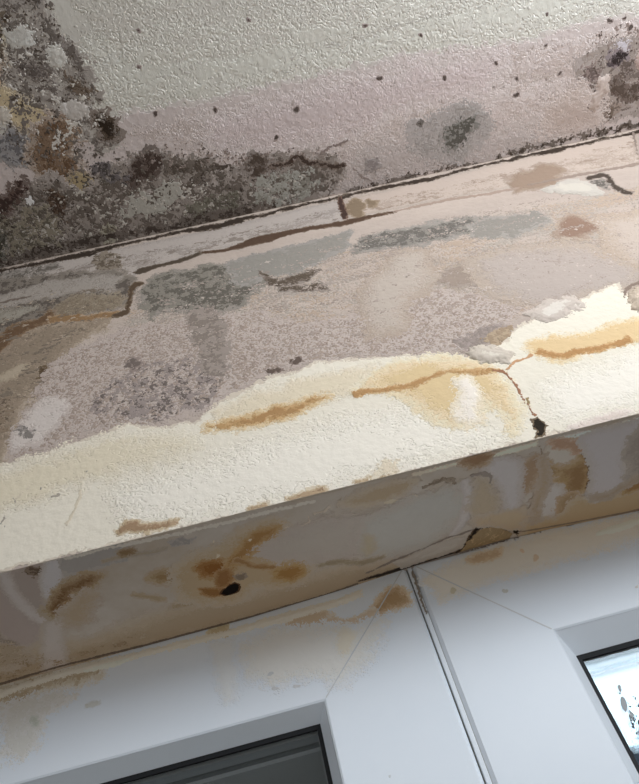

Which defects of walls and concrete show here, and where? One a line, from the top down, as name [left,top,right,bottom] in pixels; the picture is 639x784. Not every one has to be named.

crack [0,130,639,318]
water stain [0,0,639,527]
peeling [0,352,436,572]
rust [190,521,311,599]
rust [198,389,335,436]
crack [0,509,639,685]
water stain [0,424,639,771]
rust [351,366,502,399]
peeling [393,527,513,569]
crack [492,353,537,416]
peeling [400,282,639,477]
rust [522,435,589,516]